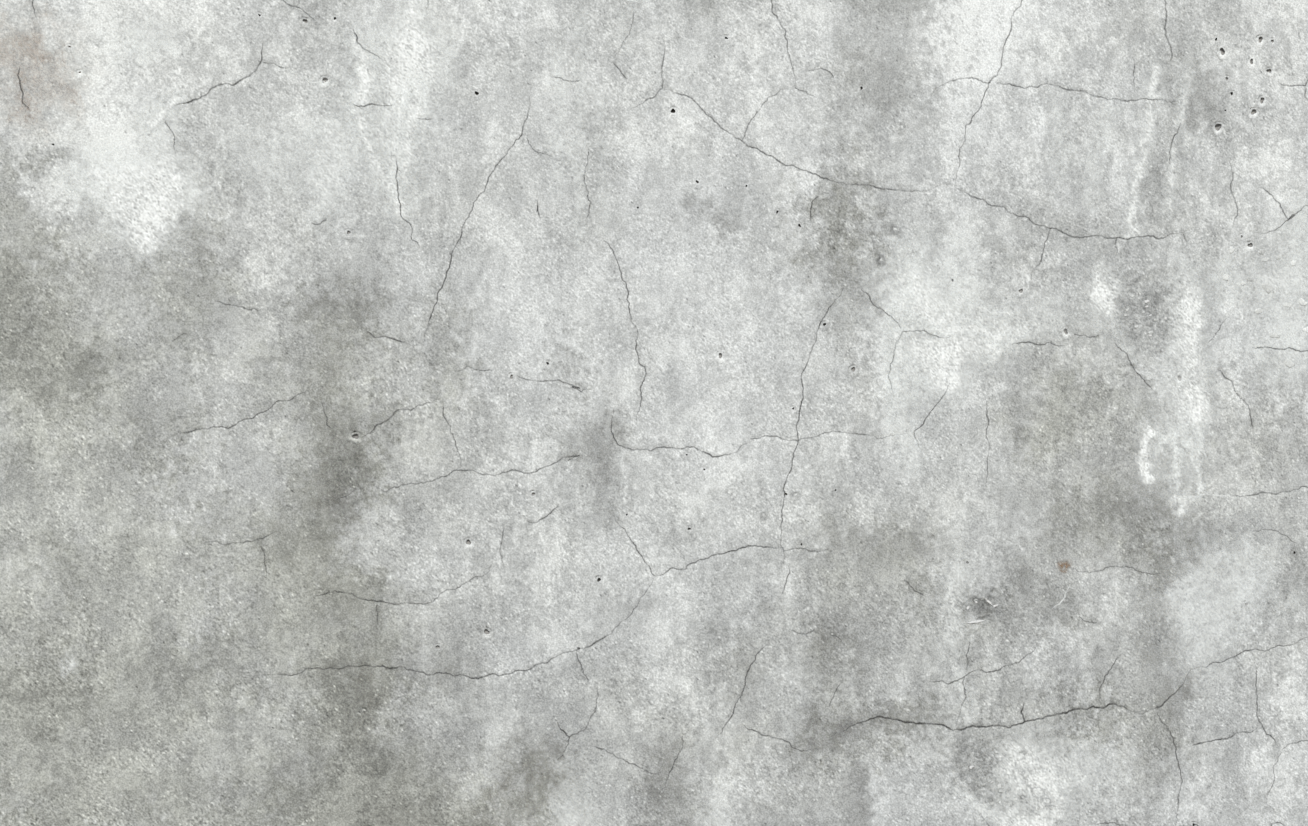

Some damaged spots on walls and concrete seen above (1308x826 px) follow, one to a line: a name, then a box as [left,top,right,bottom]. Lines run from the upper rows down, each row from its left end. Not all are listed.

crack [681,94,828,214]
leakage [1087,262,1120,328]
crack [629,362,858,575]
leakage [1137,260,1227,517]
crack [860,660,1232,826]